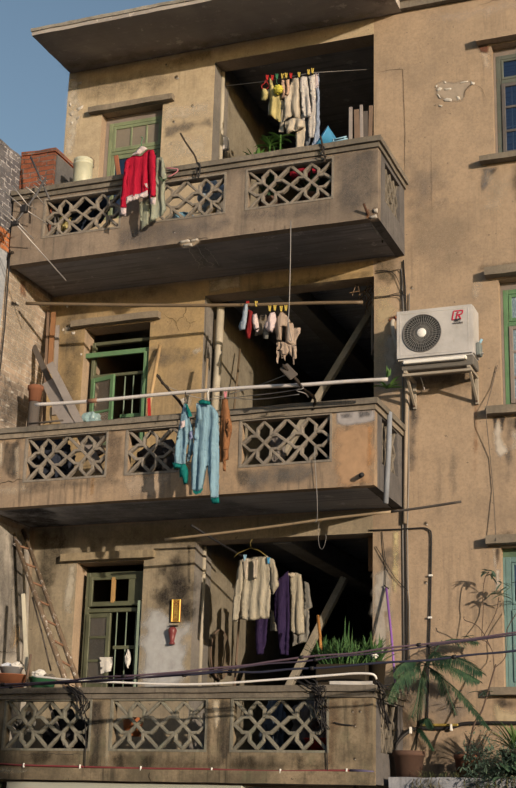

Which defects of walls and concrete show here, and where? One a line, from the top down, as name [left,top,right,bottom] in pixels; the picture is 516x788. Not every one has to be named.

spalling [436,81,486,107]
leakage [11,537,23,640]